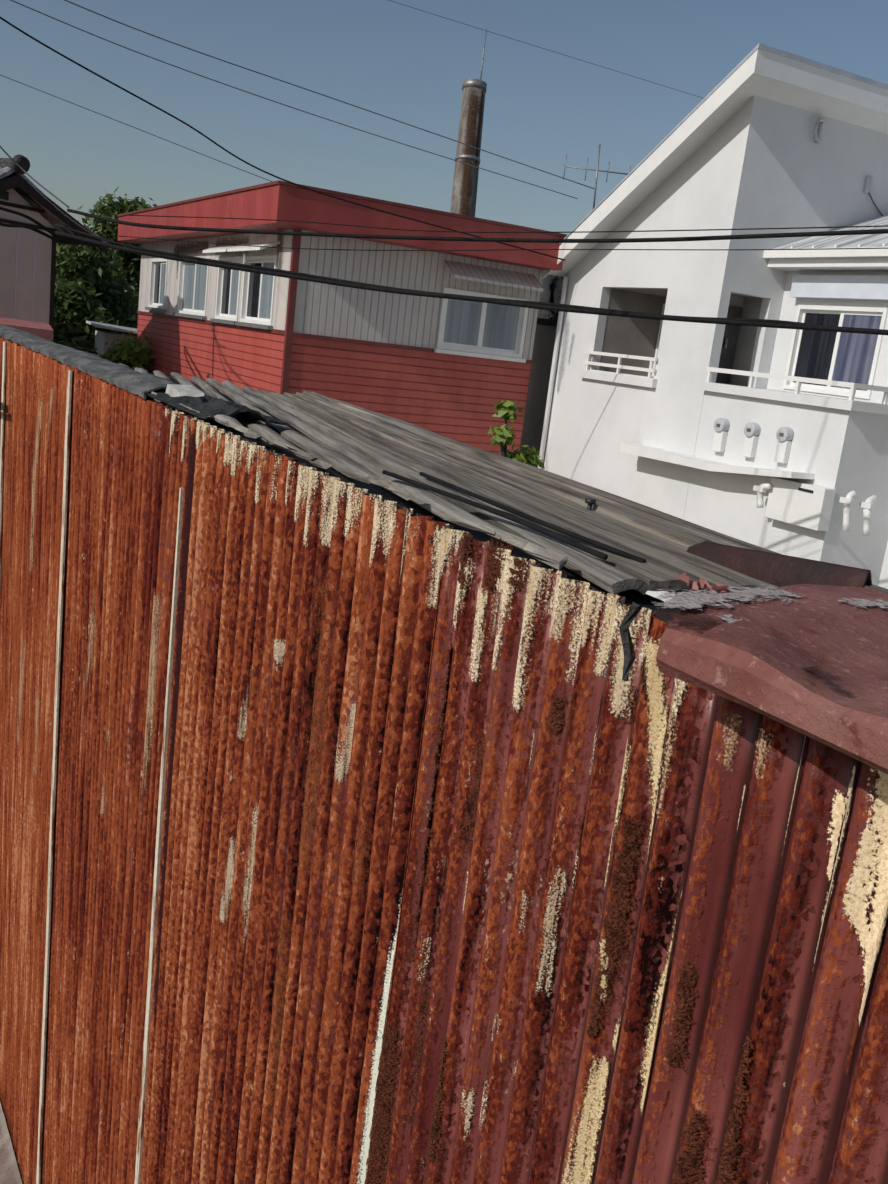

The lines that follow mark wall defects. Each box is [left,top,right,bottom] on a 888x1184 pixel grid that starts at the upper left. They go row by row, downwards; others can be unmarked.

peeling [165,408,418,581]
rust [458,532,530,593]
rust [153,429,197,1026]
peeling [219,805,259,947]
peeling [335,701,356,783]
rust [406,645,454,965]
peeling [426,524,803,895]
rust [584,803,645,1038]
peeling [813,766,888,1026]
rust [364,990,431,1184]
peeling [556,1015,621,1184]
rust [672,1033,754,1184]